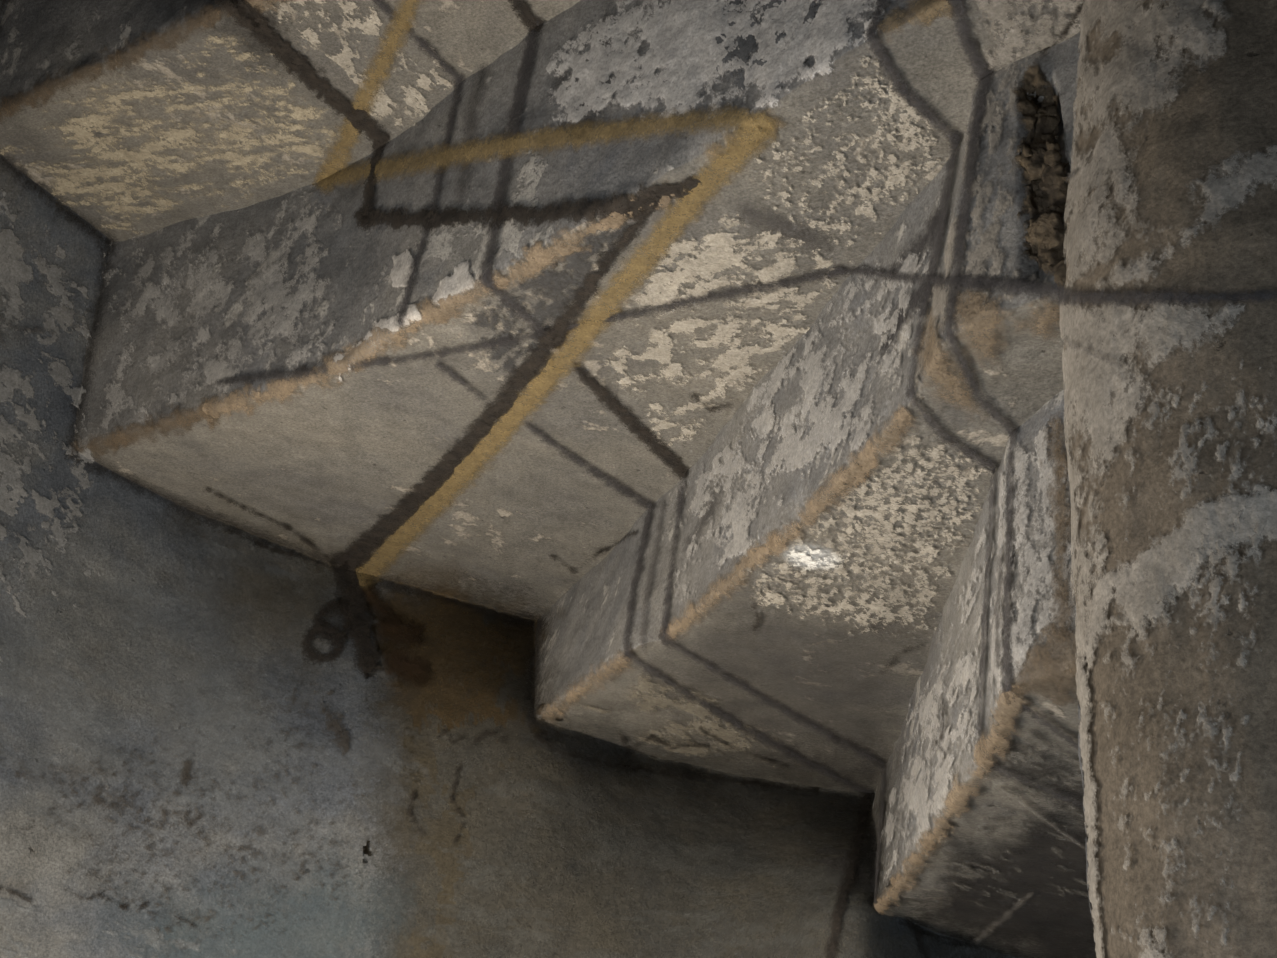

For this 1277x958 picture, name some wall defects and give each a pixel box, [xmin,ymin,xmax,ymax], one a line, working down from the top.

water stain [379,576,540,744]
flaking render [378,0,1277,958]